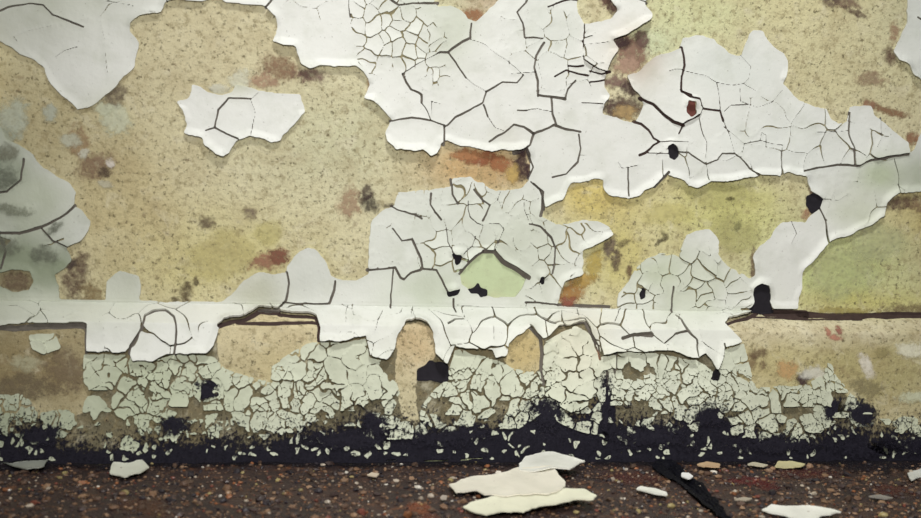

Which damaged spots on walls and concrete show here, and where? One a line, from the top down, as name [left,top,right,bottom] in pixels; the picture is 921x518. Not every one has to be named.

crack [621,46,909,237]
crack [365,0,698,386]
crack [0,323,88,354]
crack [217,271,336,343]
crack [724,309,921,346]
flaking render [0,328,128,439]
peeling [430,390,490,431]
damp [0,370,921,464]
peeling [498,398,540,429]
peeling [555,408,591,434]
peeling [724,374,781,438]
peeling [773,363,848,433]